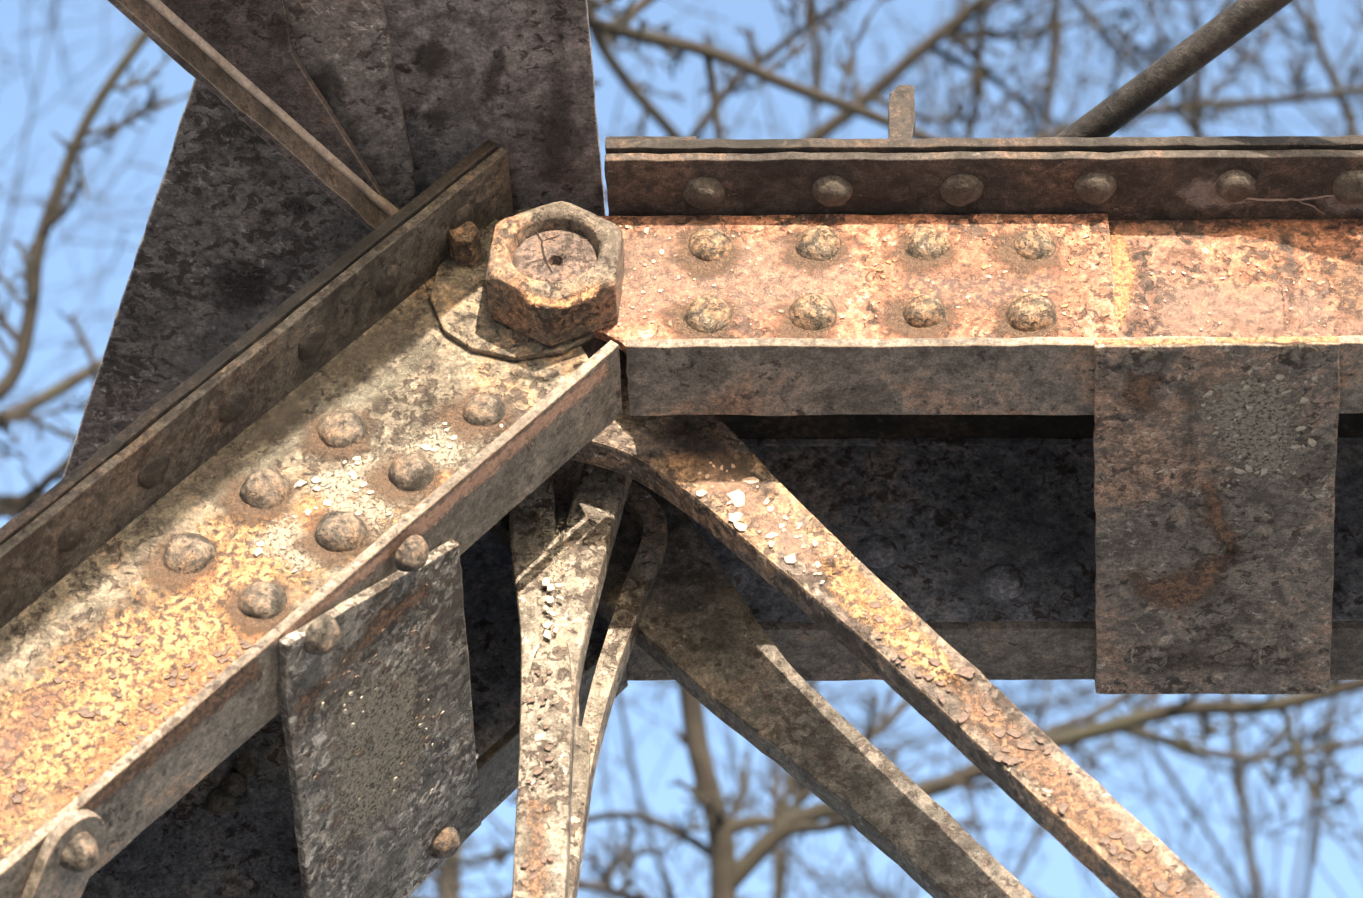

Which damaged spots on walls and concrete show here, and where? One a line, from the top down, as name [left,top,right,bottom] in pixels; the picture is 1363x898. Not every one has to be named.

rust [783,227,848,272]
rust [526,285,599,307]
rust [667,301,735,339]
rust [775,301,838,339]
rust [863,229,1089,338]
rust [1096,231,1340,345]
rust [1325,259,1363,318]
rust [0,361,608,854]
rust [1128,548,1247,610]
rust [820,553,1213,898]
rust [520,669,555,898]